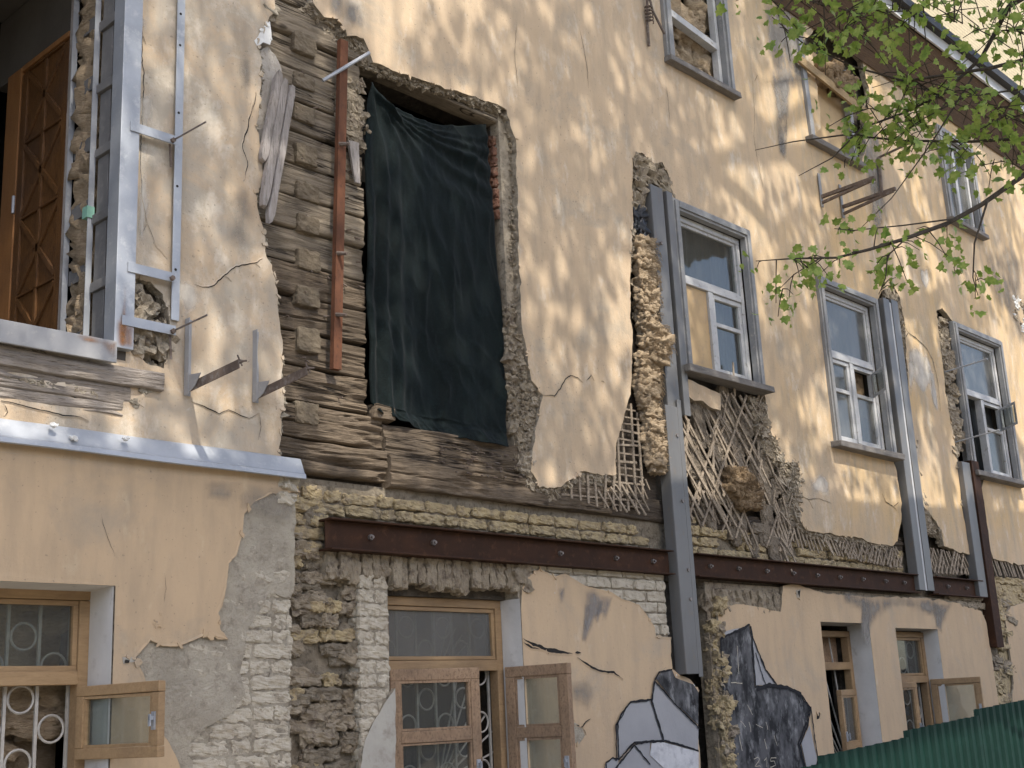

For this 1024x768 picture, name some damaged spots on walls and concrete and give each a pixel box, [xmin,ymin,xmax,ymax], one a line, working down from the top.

flaking render [254,3,281,131]
crack [194,258,263,288]
flaking render [297,2,617,502]
crack [191,401,261,440]
crack [543,375,605,398]
peeling [903,340,956,441]
flaking render [740,396,890,553]
spalling [290,485,356,658]
spalling [505,564,671,639]
spalling [696,588,780,613]
crack [522,638,623,681]
spalling [289,671,360,768]